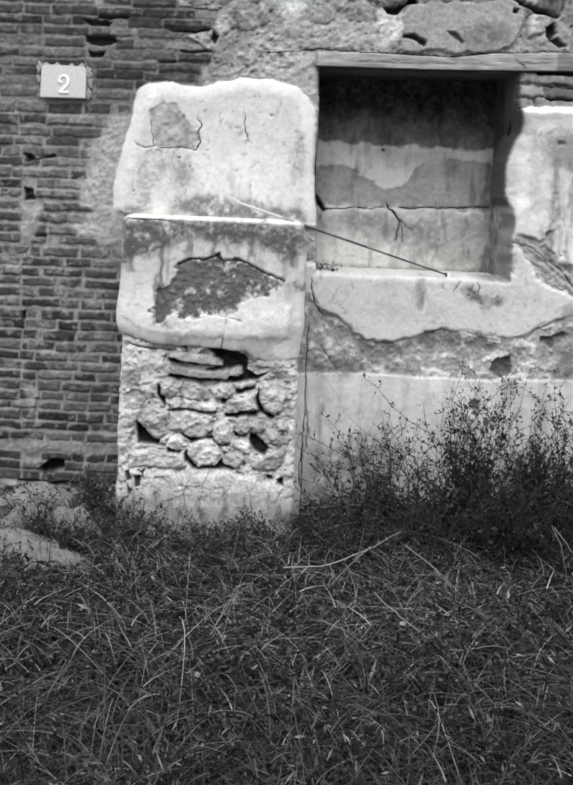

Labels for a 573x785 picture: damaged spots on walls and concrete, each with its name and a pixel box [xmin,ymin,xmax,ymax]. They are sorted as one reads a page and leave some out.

peeling [131,101,199,214]
crack [325,202,489,242]
spalling [148,253,286,324]
spalling [509,229,573,297]
spalling [120,296,573,490]